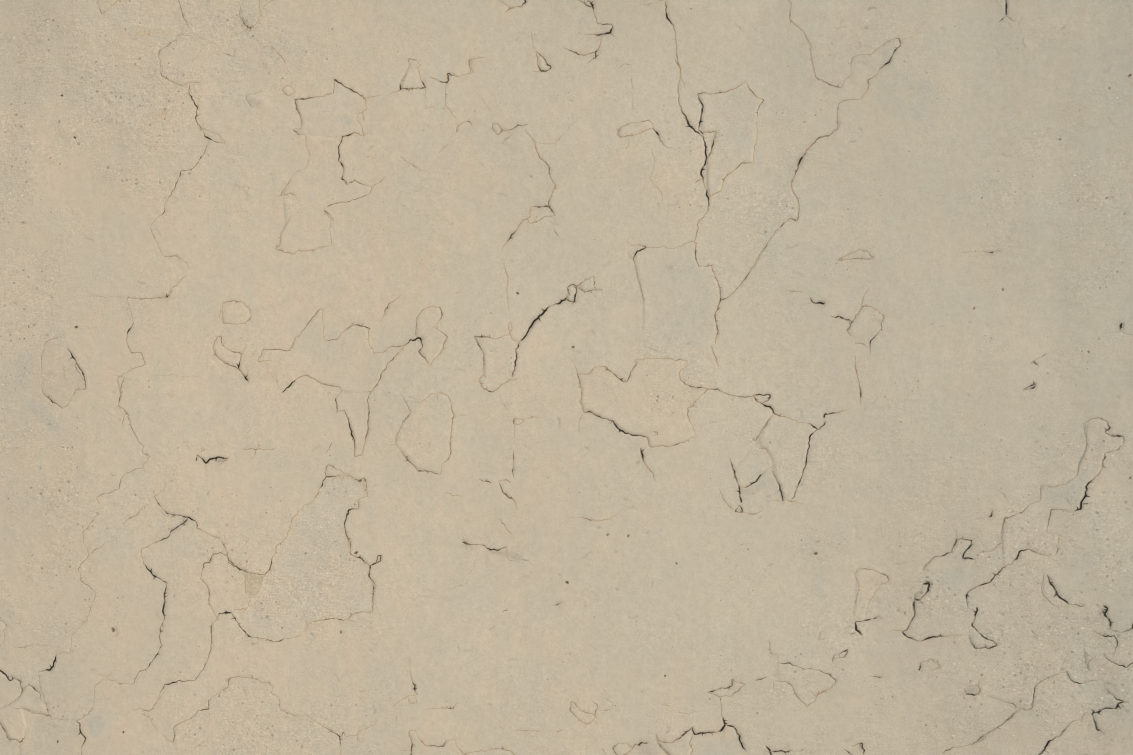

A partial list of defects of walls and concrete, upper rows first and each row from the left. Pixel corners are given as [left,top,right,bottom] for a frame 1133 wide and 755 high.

peeling [531,32,551,72]
peeling [698,81,764,197]
crack [665,0,862,430]
peeling [566,276,603,303]
peeling [474,322,520,392]
peeling [719,414,817,515]
peeling [893,417,1125,649]
peeling [832,568,889,668]
peeling [1084,604,1133,670]
peeling [0,670,54,754]